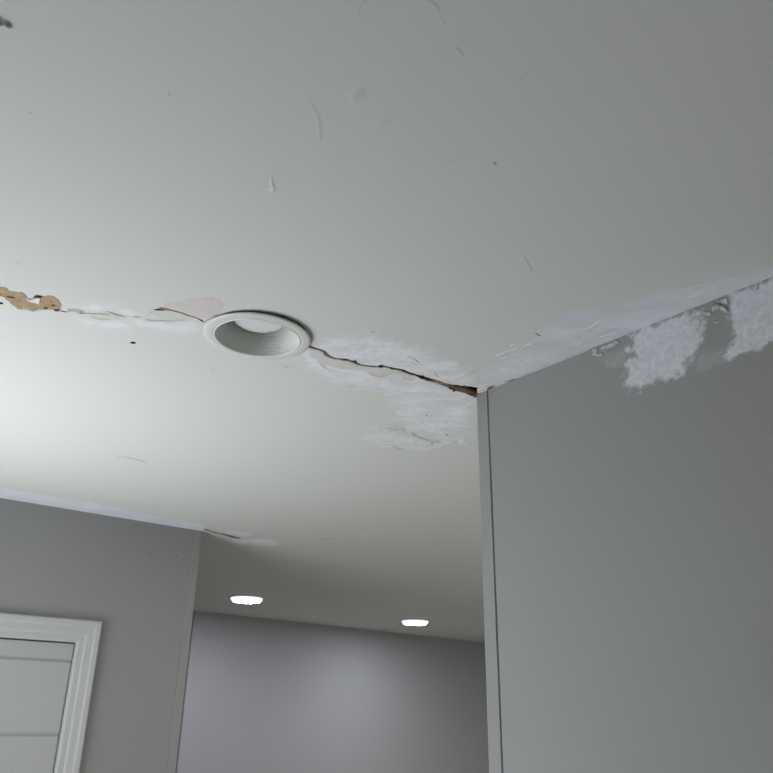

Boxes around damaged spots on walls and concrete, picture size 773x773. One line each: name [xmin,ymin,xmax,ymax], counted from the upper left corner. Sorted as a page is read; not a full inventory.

peeling [0,287,65,313]
crack [309,346,590,398]